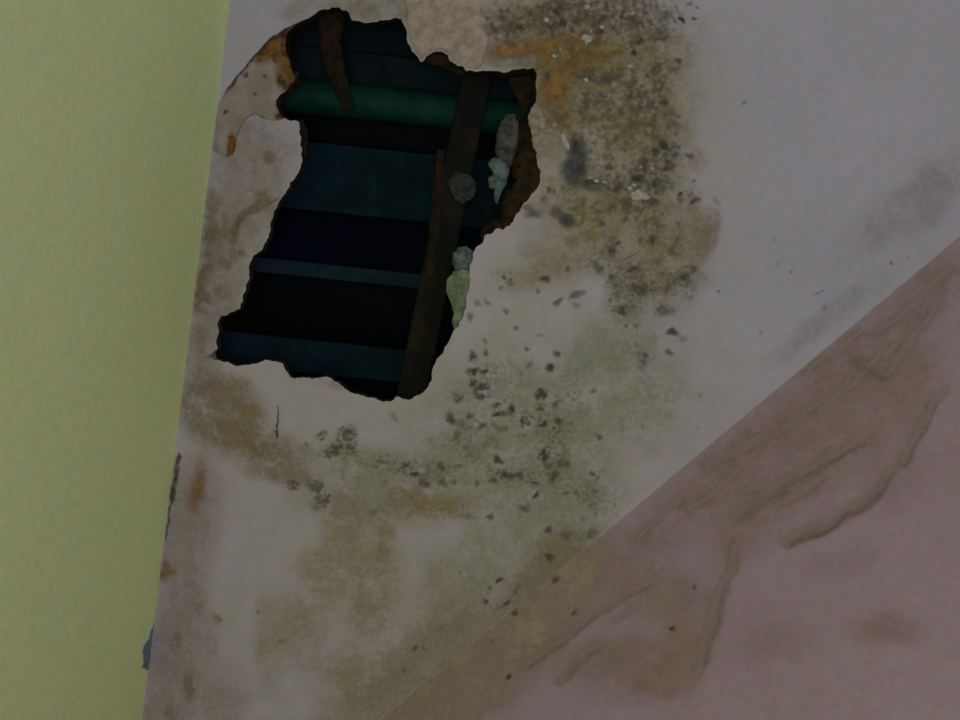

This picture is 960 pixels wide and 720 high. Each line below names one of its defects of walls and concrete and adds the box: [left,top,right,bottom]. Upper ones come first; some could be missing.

damp [184,122,282,457]
peeling [213,21,302,157]
spalling [528,105,545,157]
corrosion [491,34,597,106]
damp [487,0,714,311]
damp [287,388,601,720]